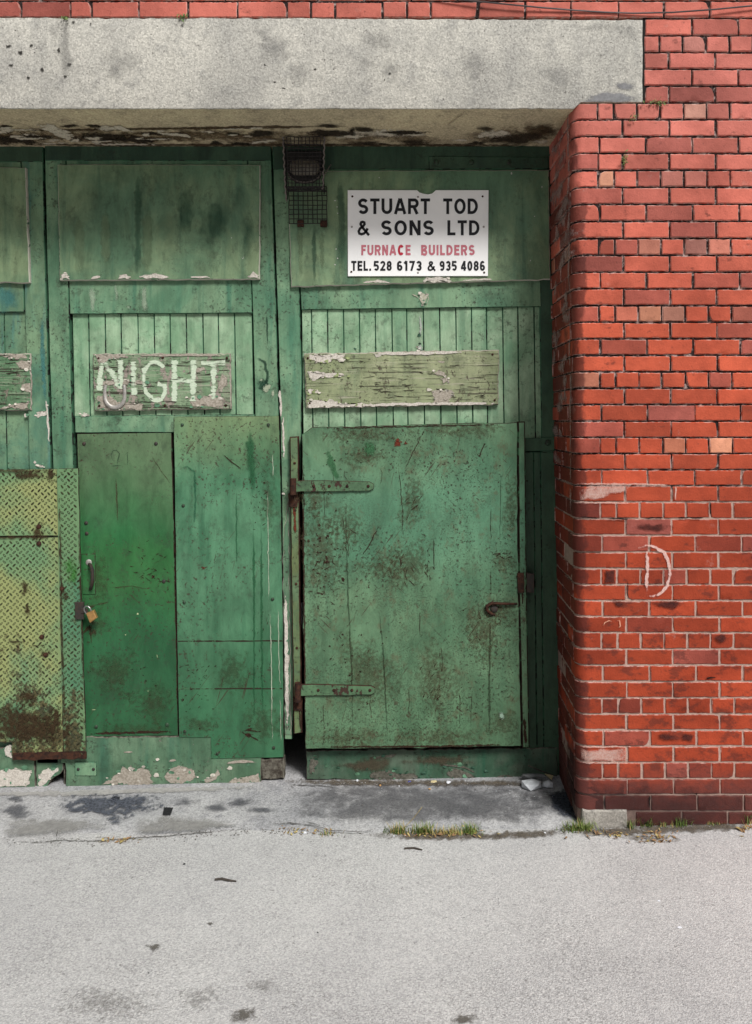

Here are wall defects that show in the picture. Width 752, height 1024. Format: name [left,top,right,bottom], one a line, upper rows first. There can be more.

water stain [57,125,519,147]
peeling [96,353,222,372]
peeling [307,276,493,408]
peeling [0,353,50,440]
peeling [79,379,160,417]
peeling [185,373,227,408]
rust [293,465,369,684]
rust [0,498,108,751]
peeling [0,745,59,788]
peeling [101,751,260,785]